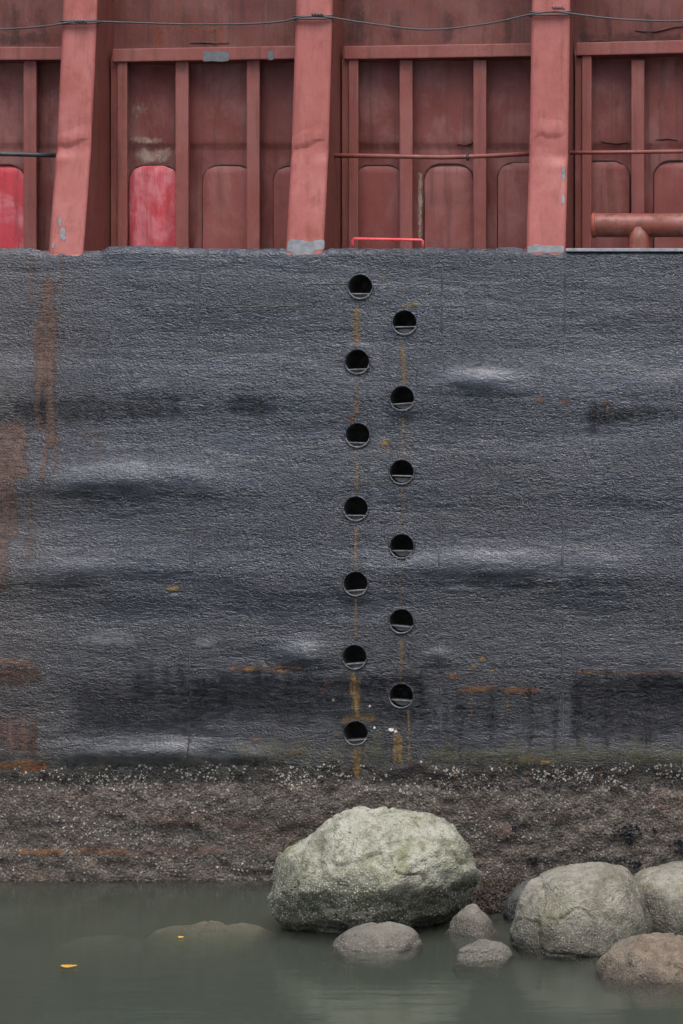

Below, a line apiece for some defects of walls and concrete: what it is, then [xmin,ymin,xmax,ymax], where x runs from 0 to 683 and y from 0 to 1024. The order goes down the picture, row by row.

water stain [78,664,429,728]
corrosion [342,674,376,723]
water stain [571,671,683,752]